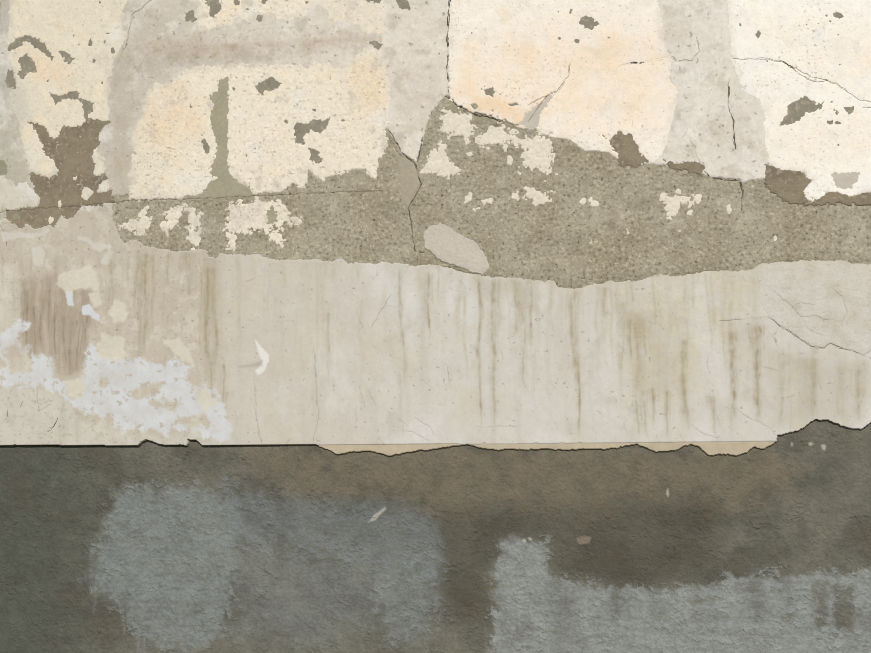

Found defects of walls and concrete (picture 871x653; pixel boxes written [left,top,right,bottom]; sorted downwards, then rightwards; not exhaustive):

crack [728,83,736,149]
crack [733,57,871,108]
damp [389,263,438,442]
spalling [0,75,871,532]
damp [465,273,542,439]
damp [552,280,871,441]
crack [774,299,868,354]